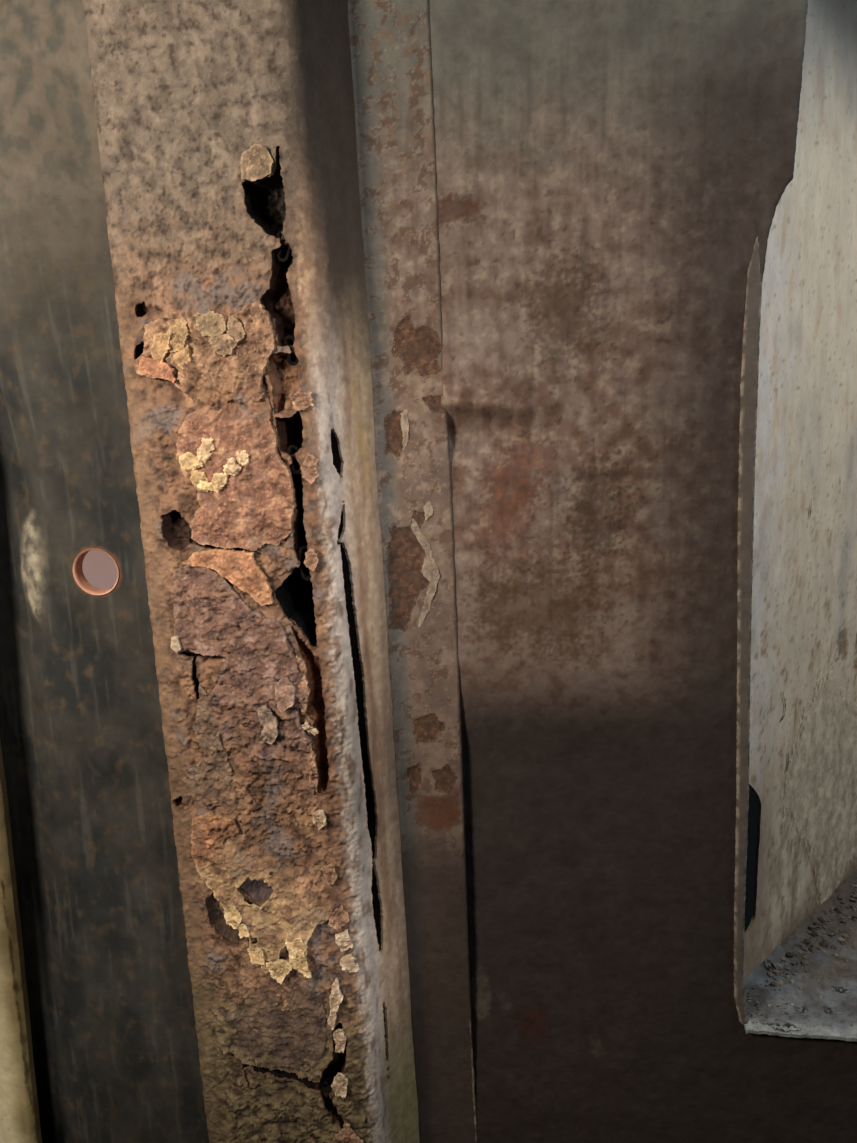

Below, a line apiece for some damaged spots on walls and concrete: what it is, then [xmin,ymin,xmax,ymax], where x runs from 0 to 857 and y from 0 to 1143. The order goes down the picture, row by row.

rust [240,144,274,182]
spalling [136,302,149,317]
peeling [138,310,246,383]
crack [331,430,341,475]
rust [182,549,274,606]
crack [298,546,311,581]
peeling [388,501,440,632]
crack [337,510,381,951]
spalling [206,893,312,984]
rust [327,905,360,1053]
crack [231,1053,344,1129]
rust [331,1072,348,1098]